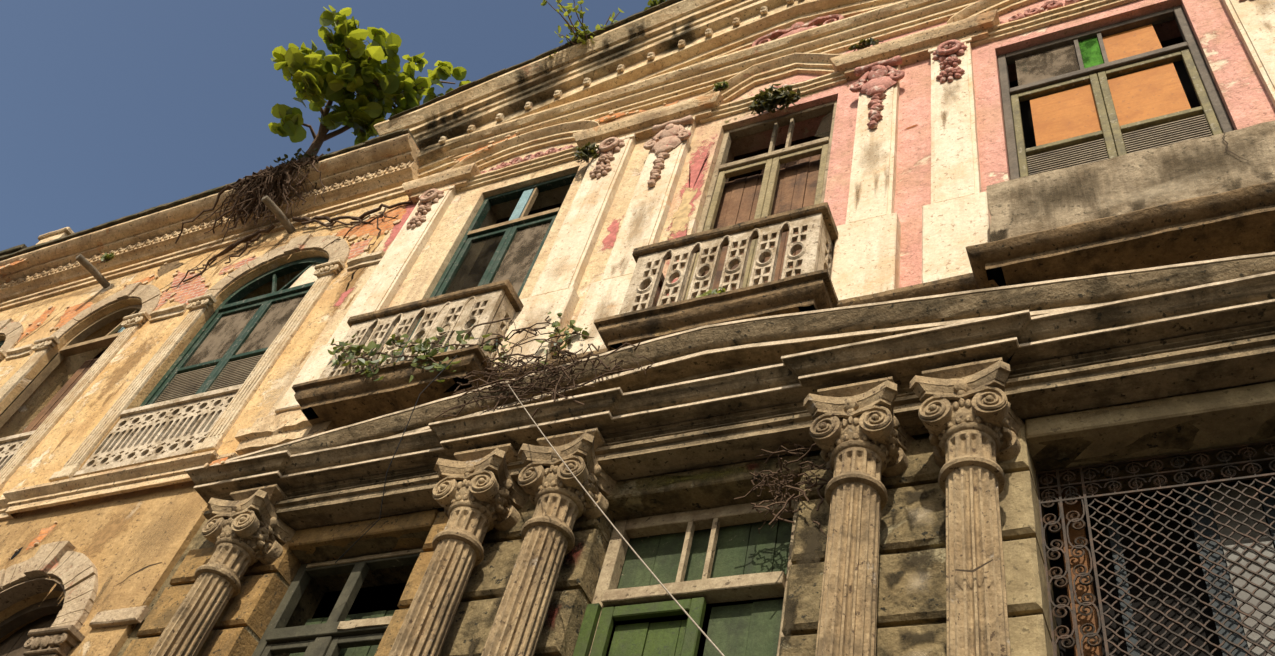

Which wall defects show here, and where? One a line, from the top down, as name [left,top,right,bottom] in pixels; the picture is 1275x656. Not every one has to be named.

leakage [1169,144,1241,174]
leakage [1036,178,1092,209]
spalling [124,239,293,311]
spalling [331,200,415,316]
spalling [15,292,105,345]
spalling [8,521,62,564]